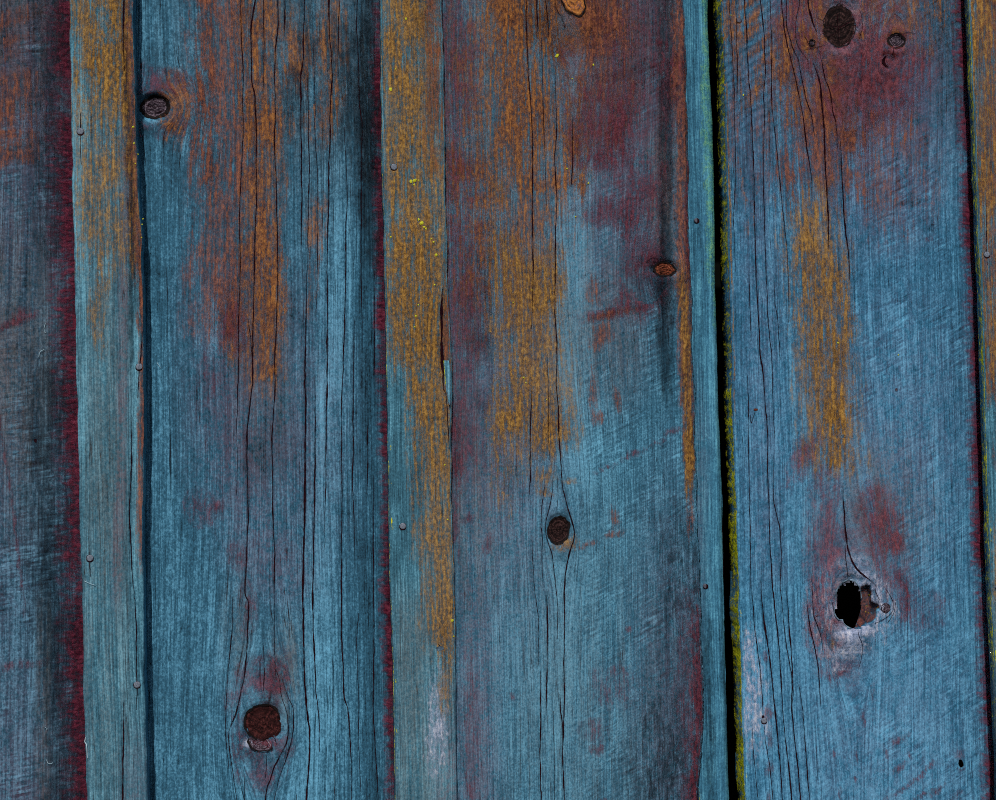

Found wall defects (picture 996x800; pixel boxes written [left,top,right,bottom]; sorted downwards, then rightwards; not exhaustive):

crack [729,0,863,800]
crack [843,499,896,666]